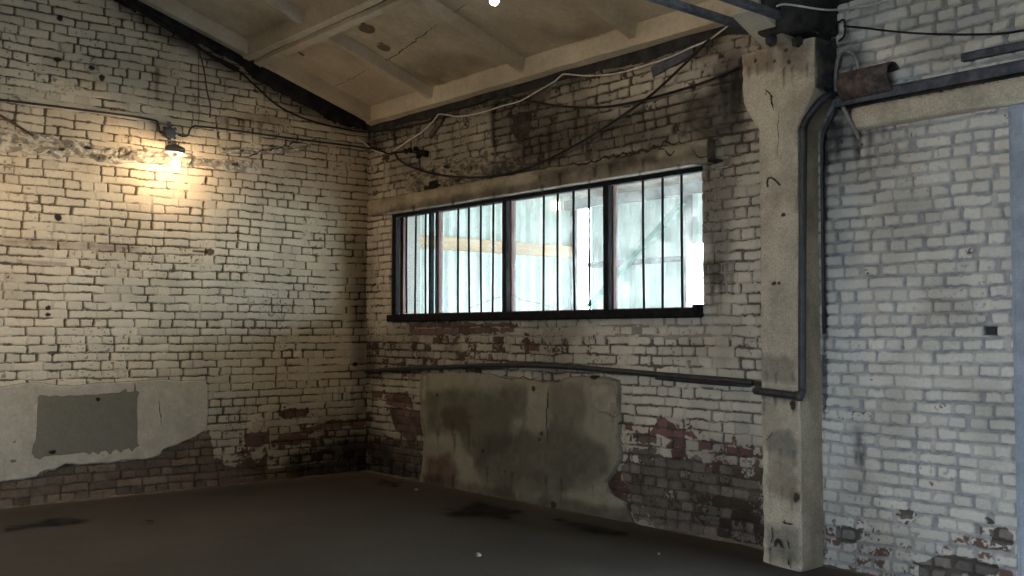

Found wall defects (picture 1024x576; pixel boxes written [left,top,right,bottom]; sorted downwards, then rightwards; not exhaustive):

crack [334,5,465,87]
crack [495,375,549,442]
flaking render [0,390,424,507]
flaking render [618,414,789,550]
peeling [832,519,874,549]
peeling [896,509,917,524]
flaking render [912,551,999,576]
peeling [985,517,1014,549]